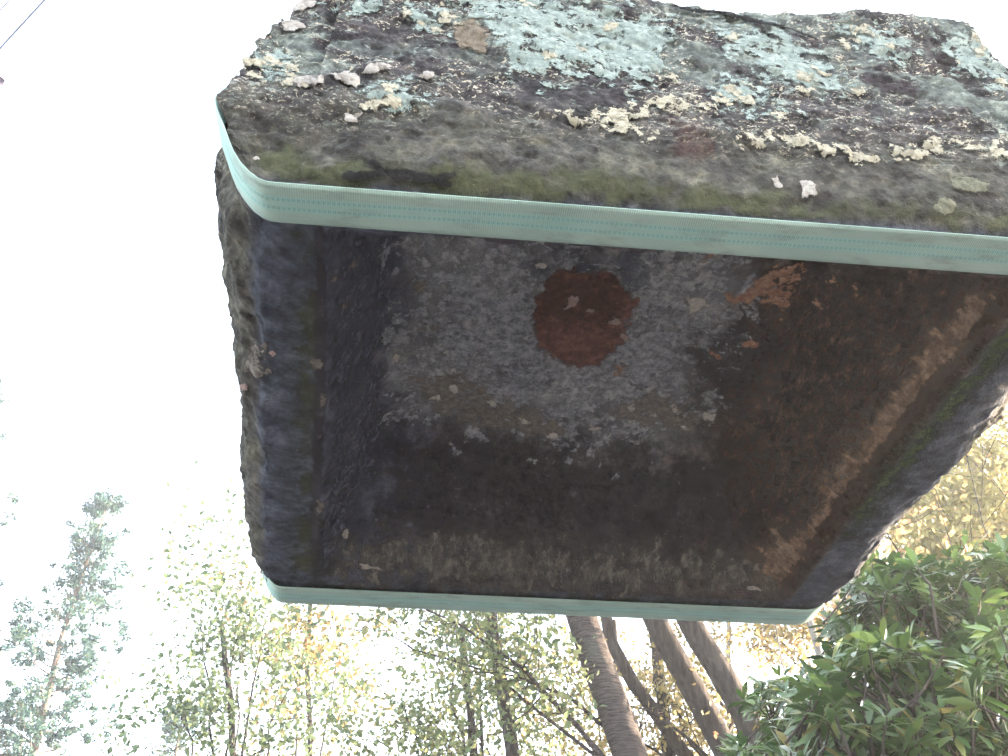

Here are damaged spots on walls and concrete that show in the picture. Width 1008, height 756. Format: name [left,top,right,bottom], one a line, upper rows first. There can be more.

corrosion [532,266,640,369]
leakage [314,229,1007,603]